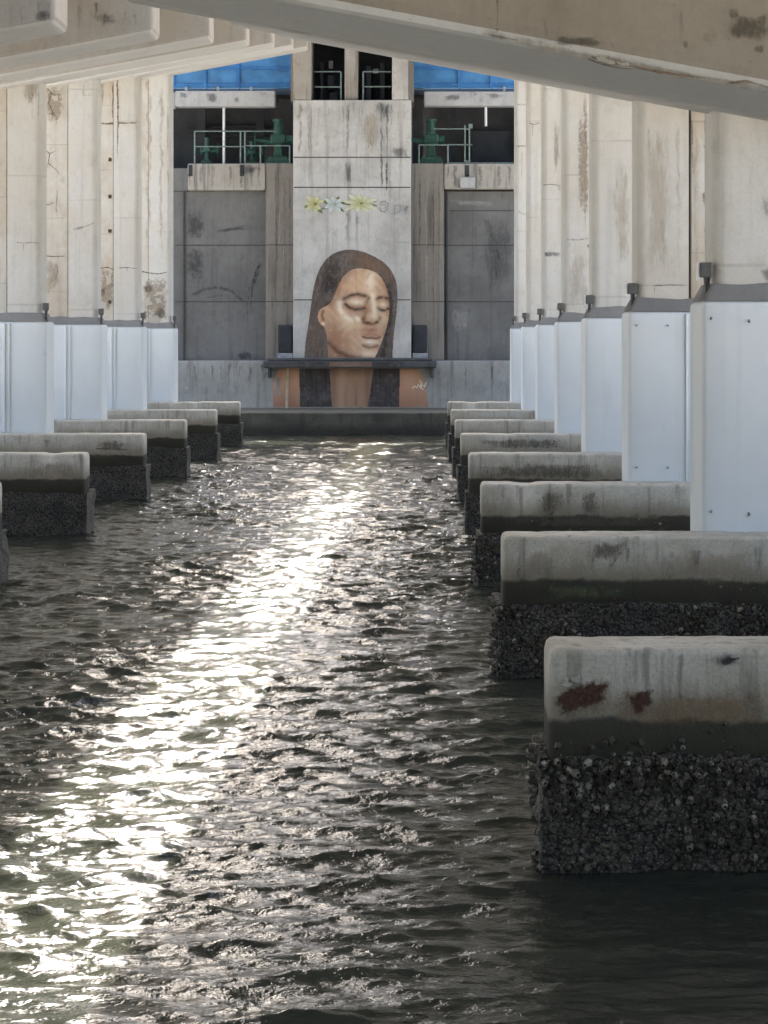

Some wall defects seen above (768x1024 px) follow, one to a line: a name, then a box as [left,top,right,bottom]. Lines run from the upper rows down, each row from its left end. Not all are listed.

spalling [142,271,169,324]
leakage [596,544,620,558]
corrosion [557,675,607,714]
corrosion [620,690,653,717]